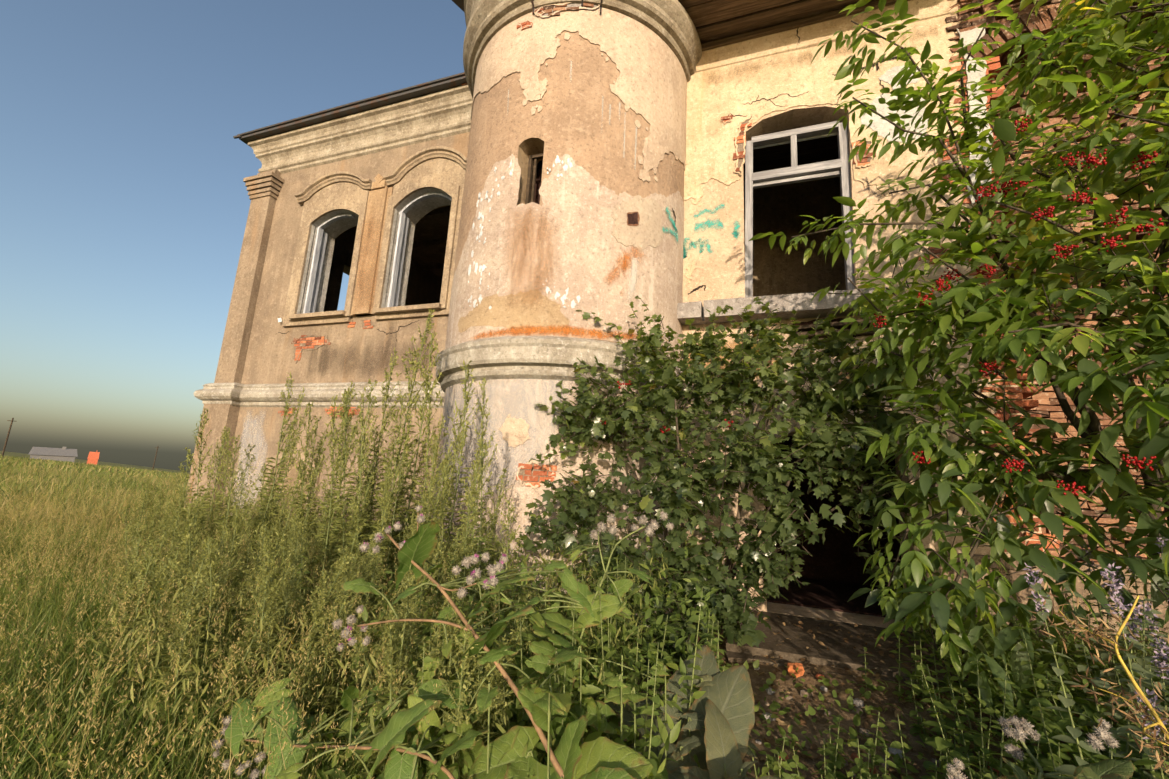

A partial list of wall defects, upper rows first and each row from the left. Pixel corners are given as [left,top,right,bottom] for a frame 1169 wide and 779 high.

crack [728,91,809,117]
peeling [445,2,964,361]
spalling [291,334,331,364]
spalling [516,460,557,489]